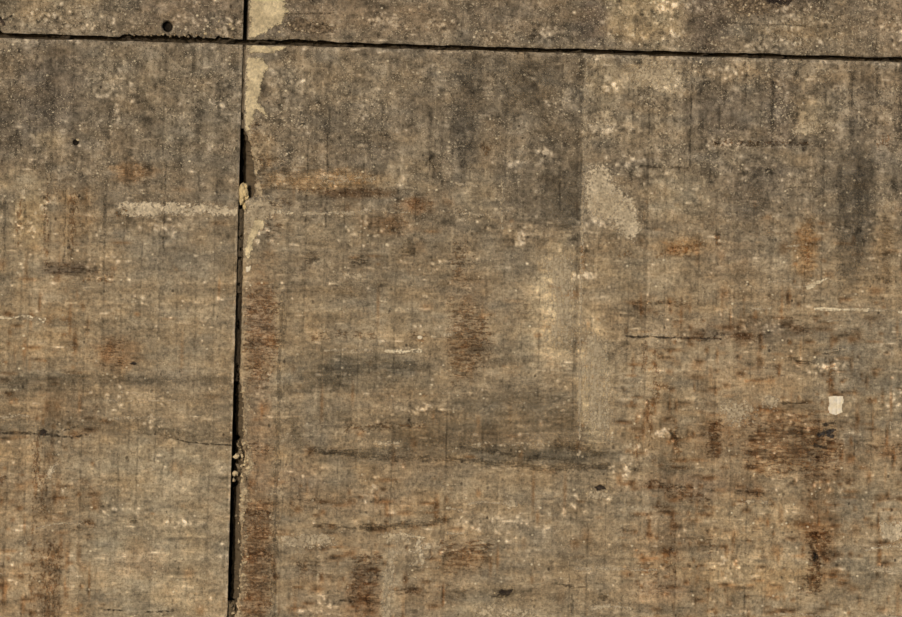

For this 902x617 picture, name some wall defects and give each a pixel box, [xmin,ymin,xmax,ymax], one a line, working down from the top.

spalling [242,130,263,198]